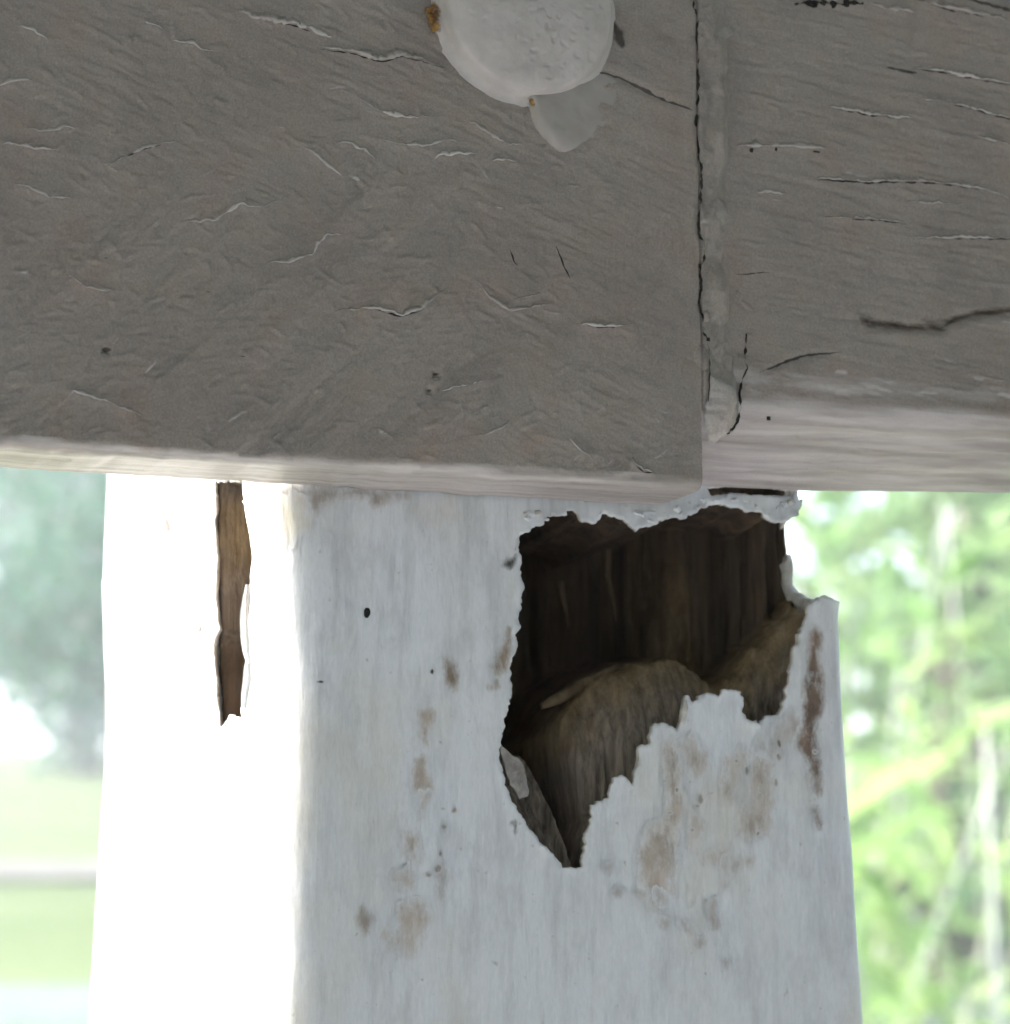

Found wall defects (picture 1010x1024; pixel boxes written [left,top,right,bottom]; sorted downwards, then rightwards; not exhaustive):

crack [864,308,1010,331]
crack [727,334,837,434]
peeling [499,745,529,800]
water stain [602,703,802,951]